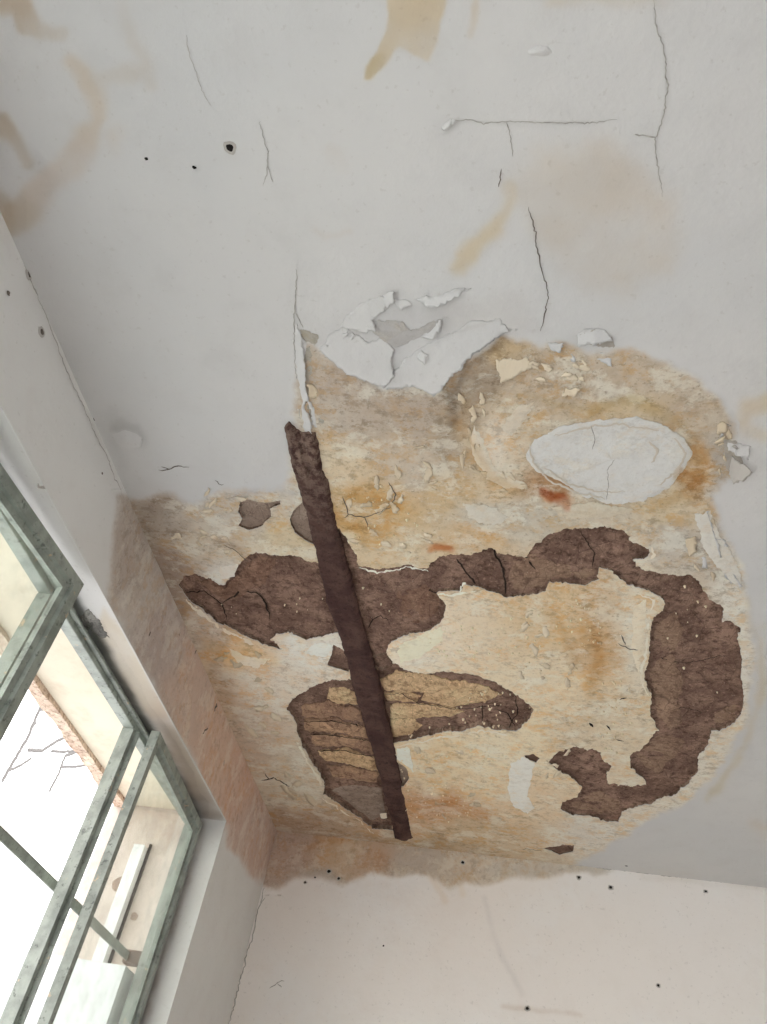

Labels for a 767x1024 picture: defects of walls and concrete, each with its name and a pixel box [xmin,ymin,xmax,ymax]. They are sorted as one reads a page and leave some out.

crack [259,122,273,184]
crack [451,0,669,192]
crack [528,207,549,328]
peeling [292,288,509,434]
peeling [496,328,615,397]
flaking render [202,488,280,530]
flaking render [290,503,312,543]
rust [285,424,321,480]
peeling [499,416,693,504]
damp [90,329,766,896]
flaking render [179,552,392,834]
flaking render [339,526,744,822]